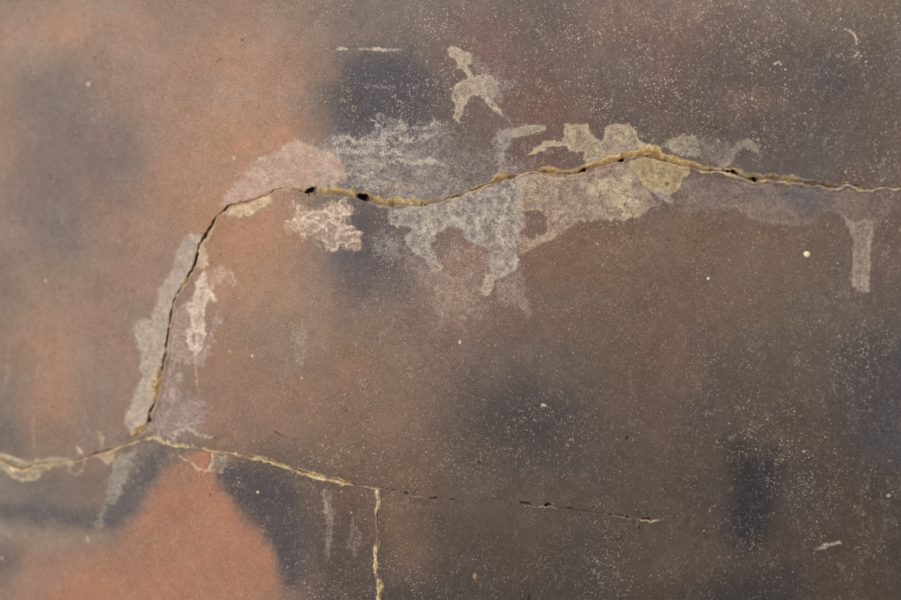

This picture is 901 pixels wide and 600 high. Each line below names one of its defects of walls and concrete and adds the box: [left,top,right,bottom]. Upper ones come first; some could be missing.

water stain [220,46,901,345]
water stain [123,232,238,473]
crack [0,139,901,600]